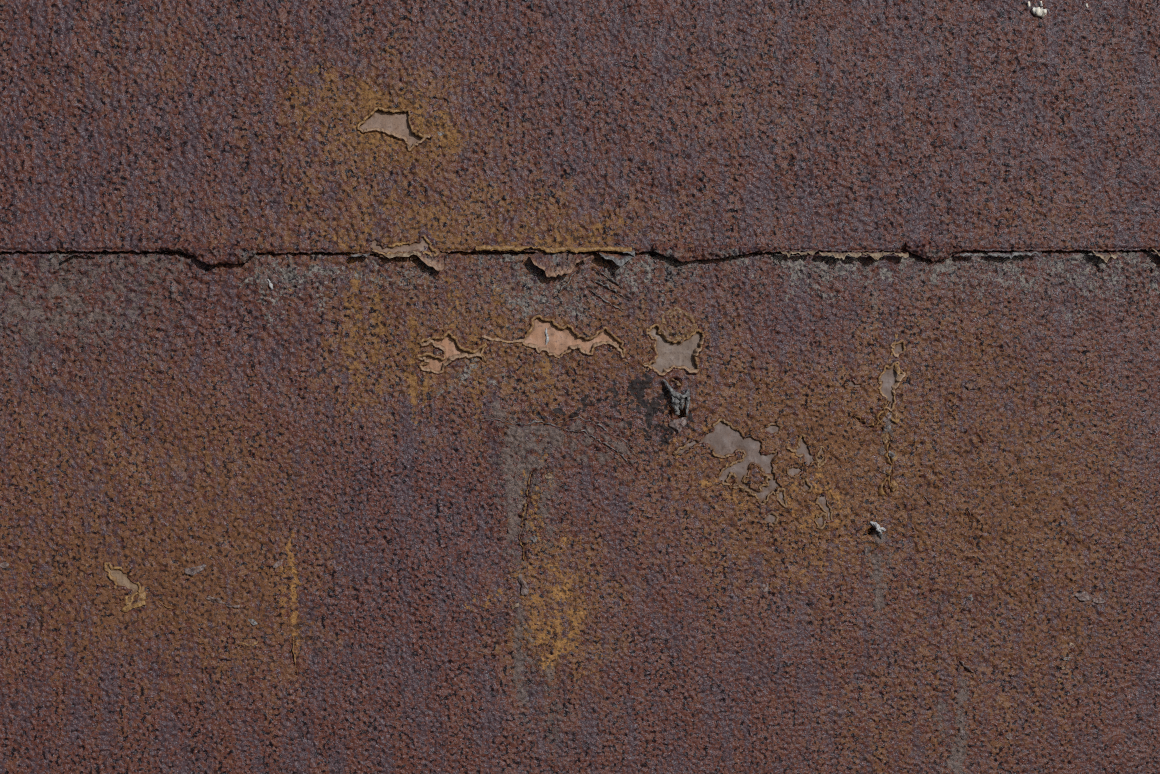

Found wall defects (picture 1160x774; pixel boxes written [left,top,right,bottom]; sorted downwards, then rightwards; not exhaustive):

peeling [356,106,444,152]
peeling [357,233,440,260]
rust [286,63,649,443]
rust [776,249,909,260]
rust [959,251,1042,259]
rust [1091,250,1122,263]
peeling [415,314,629,375]
peeling [641,307,707,386]
peeling [669,417,835,530]
rust [465,453,628,682]
rust [270,531,302,669]